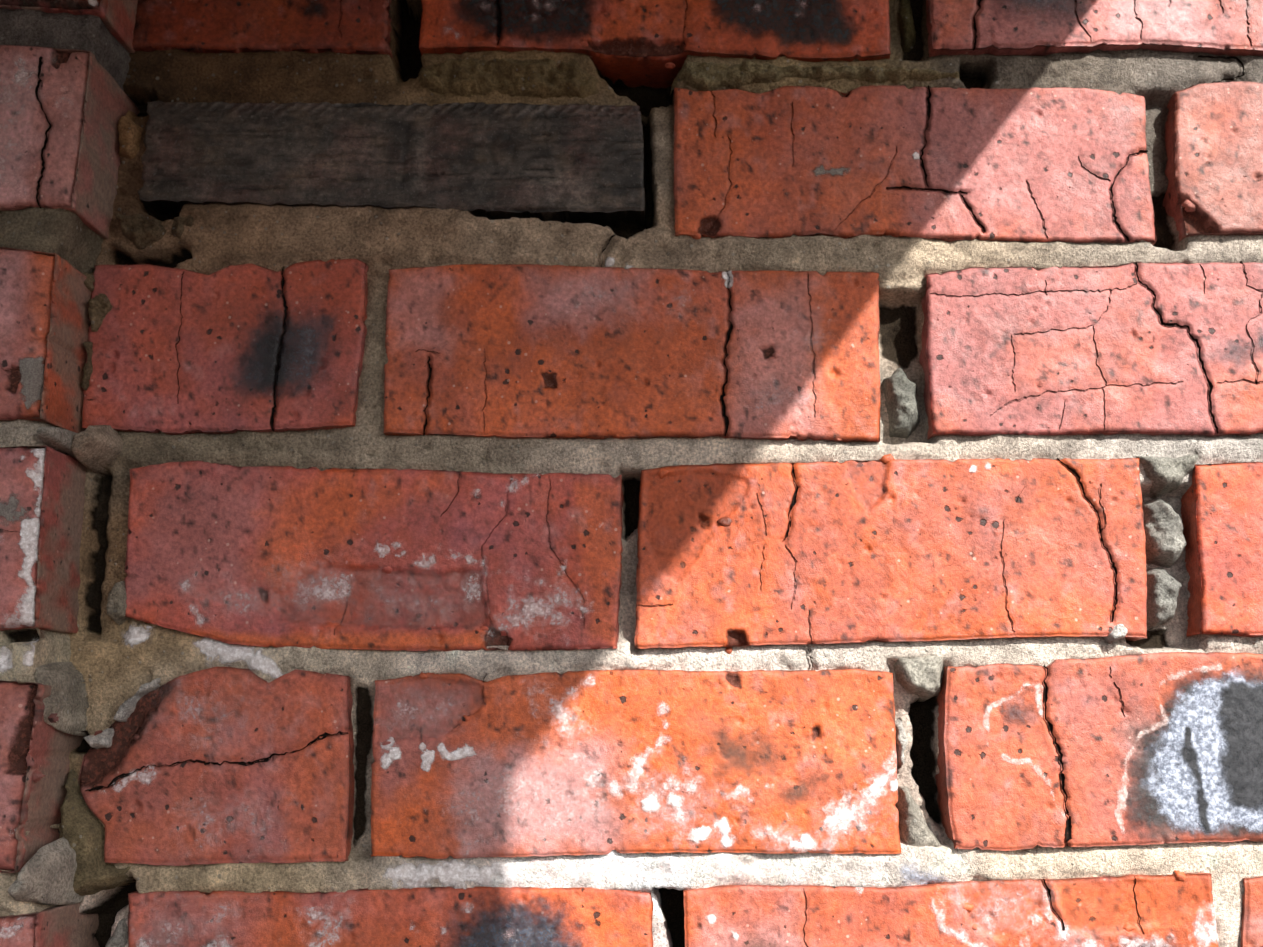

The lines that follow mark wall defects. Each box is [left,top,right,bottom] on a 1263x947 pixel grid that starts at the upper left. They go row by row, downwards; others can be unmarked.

crack [836,85,986,232]
crack [720,272,733,436]
crack [930,150,1263,631]
damp [0,448,46,628]
crack [758,464,813,669]
crack [85,731,348,791]
damp [420,743,476,772]
damp [386,860,533,889]
damp [610,704,732,847]
damp [764,828,816,852]
damp [825,762,898,832]
crack [1043,665,1072,846]